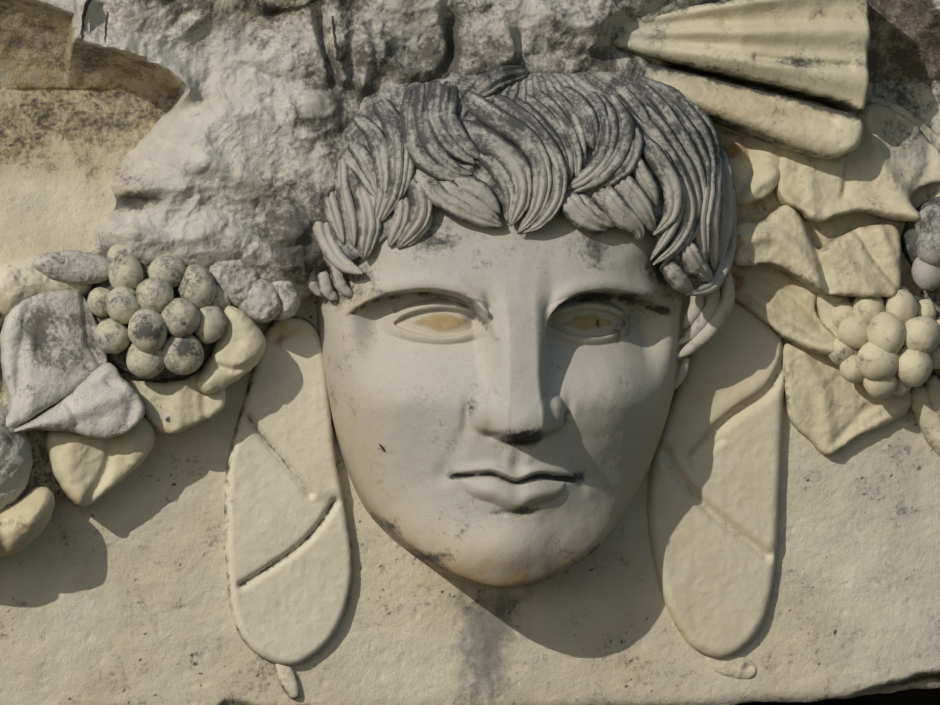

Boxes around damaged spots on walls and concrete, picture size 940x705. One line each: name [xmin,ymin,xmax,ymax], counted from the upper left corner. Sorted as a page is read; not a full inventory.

crack [80,0,108,41]